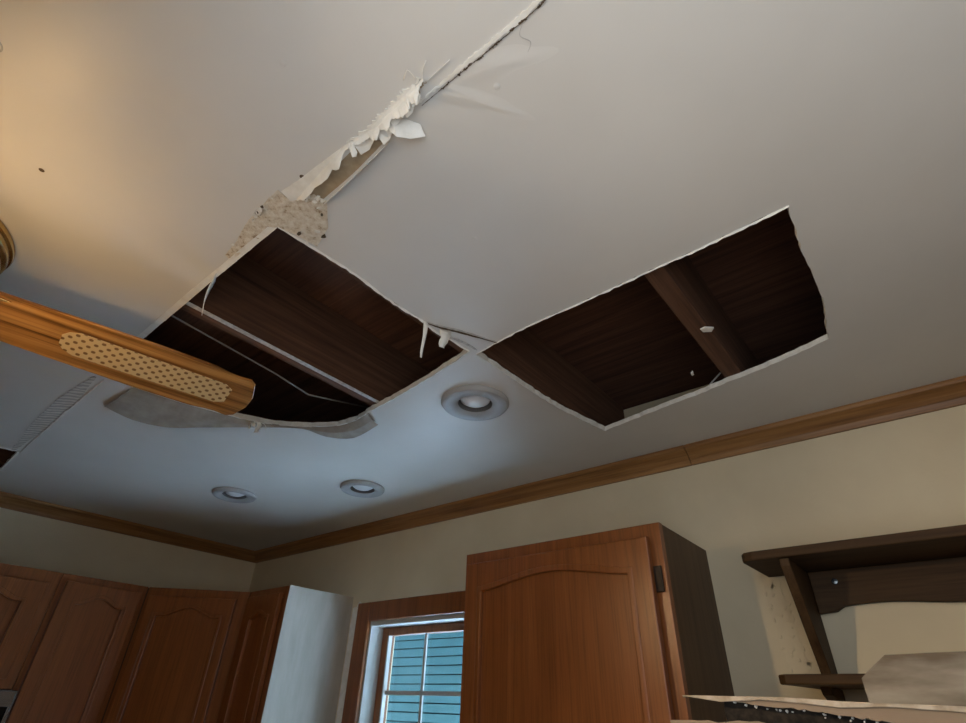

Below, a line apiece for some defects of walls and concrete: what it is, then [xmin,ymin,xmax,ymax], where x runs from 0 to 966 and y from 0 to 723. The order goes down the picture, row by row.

crack [419,0,546,105]
peeling [349,86,421,157]
spalling [225,190,328,259]